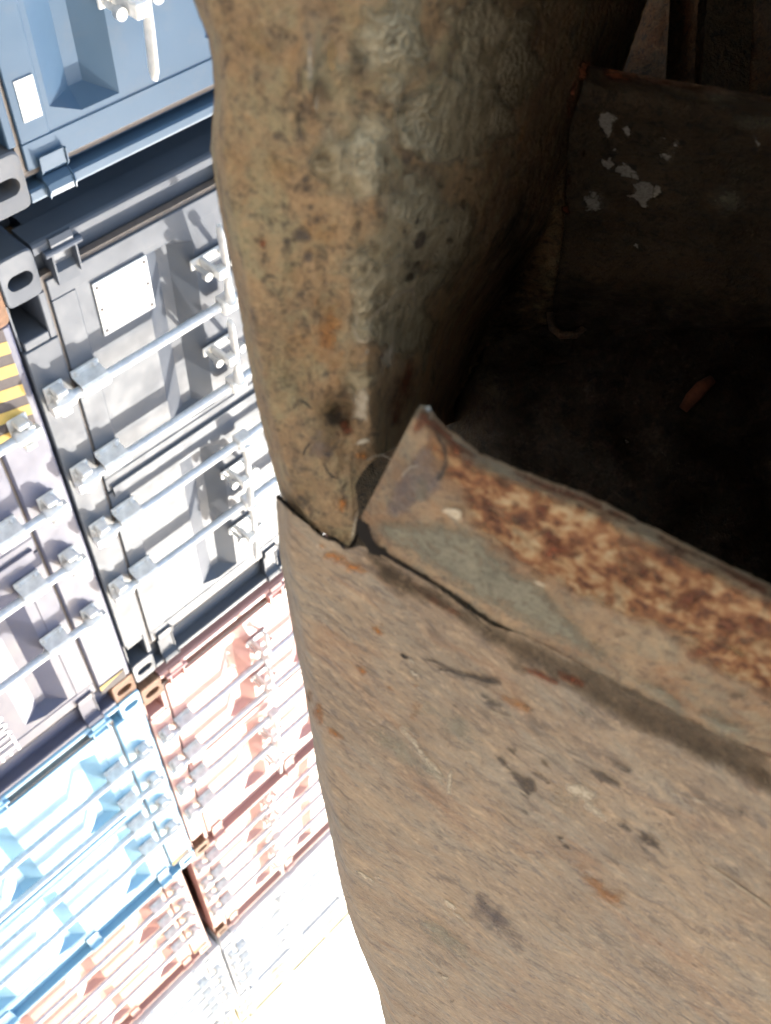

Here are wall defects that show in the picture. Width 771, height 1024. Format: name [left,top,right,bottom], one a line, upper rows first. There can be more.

crack [276,494,492,632]
rust [415,411,771,695]